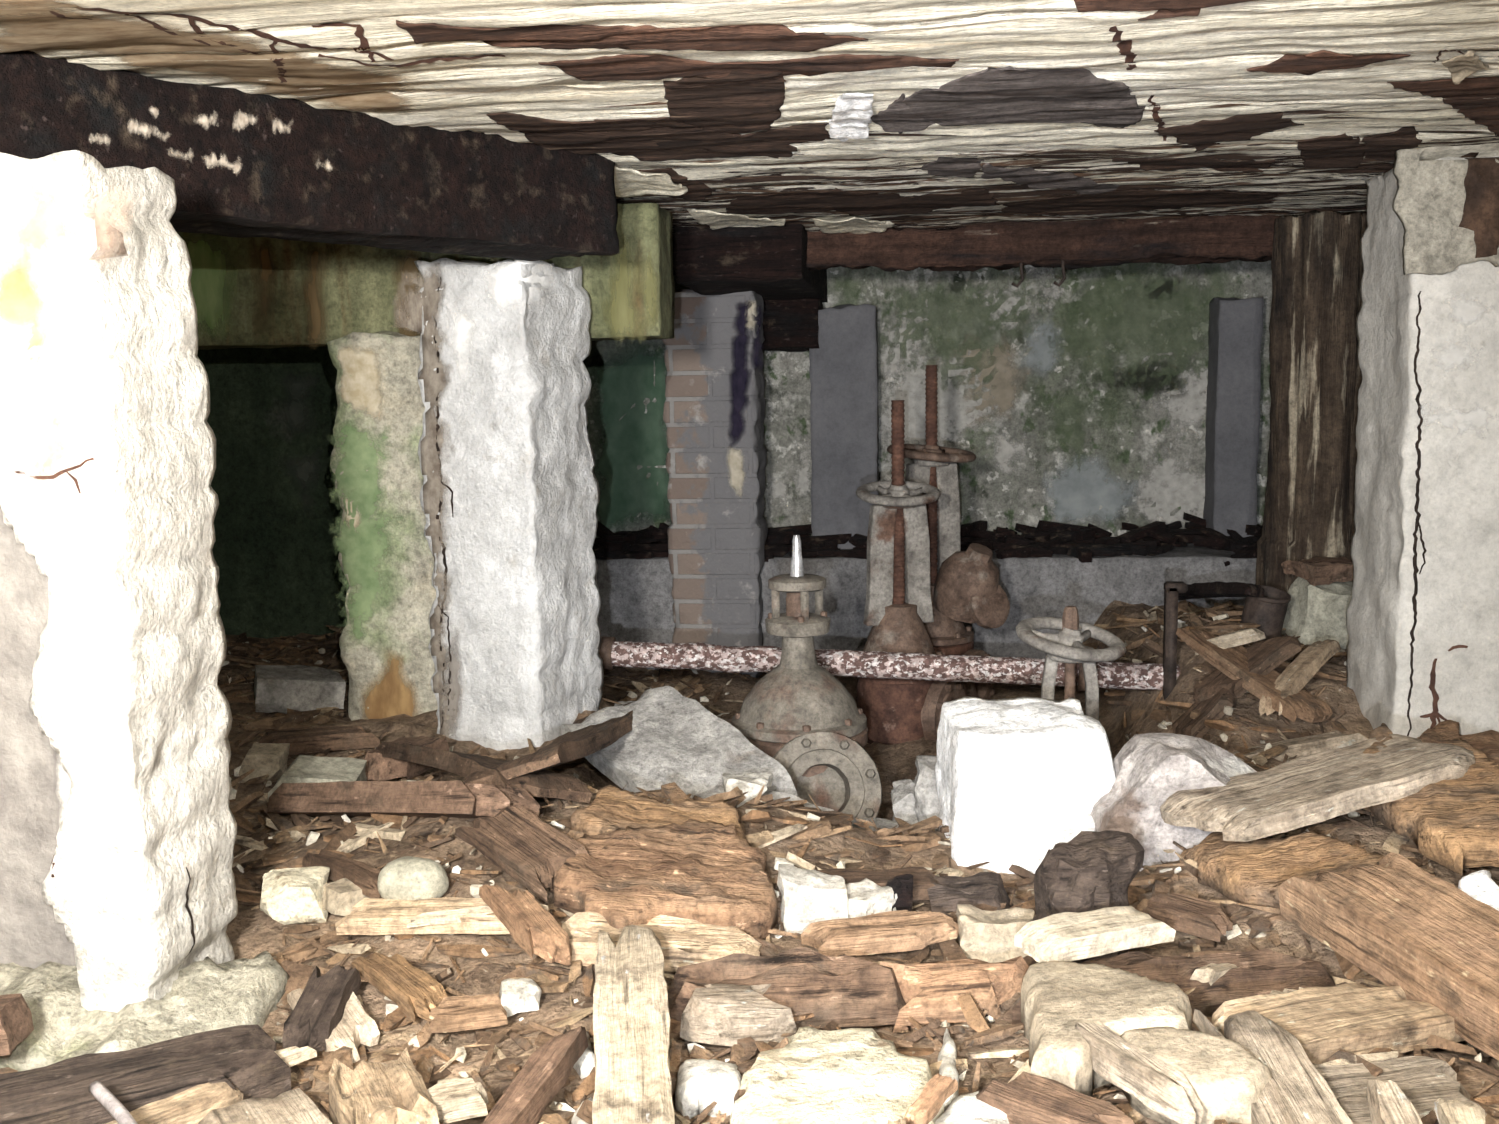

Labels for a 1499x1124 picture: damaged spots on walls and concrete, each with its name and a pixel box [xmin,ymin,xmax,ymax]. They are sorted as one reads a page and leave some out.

peeling [1138,8,1201,21]
peeling [538,54,959,81]
peeling [1247,50,1411,75]
peeling [594,92,935,153]
peeling [981,112,1304,216]
peeling [614,166,785,230]
peeling [813,216,894,234]
water stain [1130,365,1179,394]
crack [10,458,95,494]
crack [1407,291,1468,736]
corrosion [363,657,415,720]